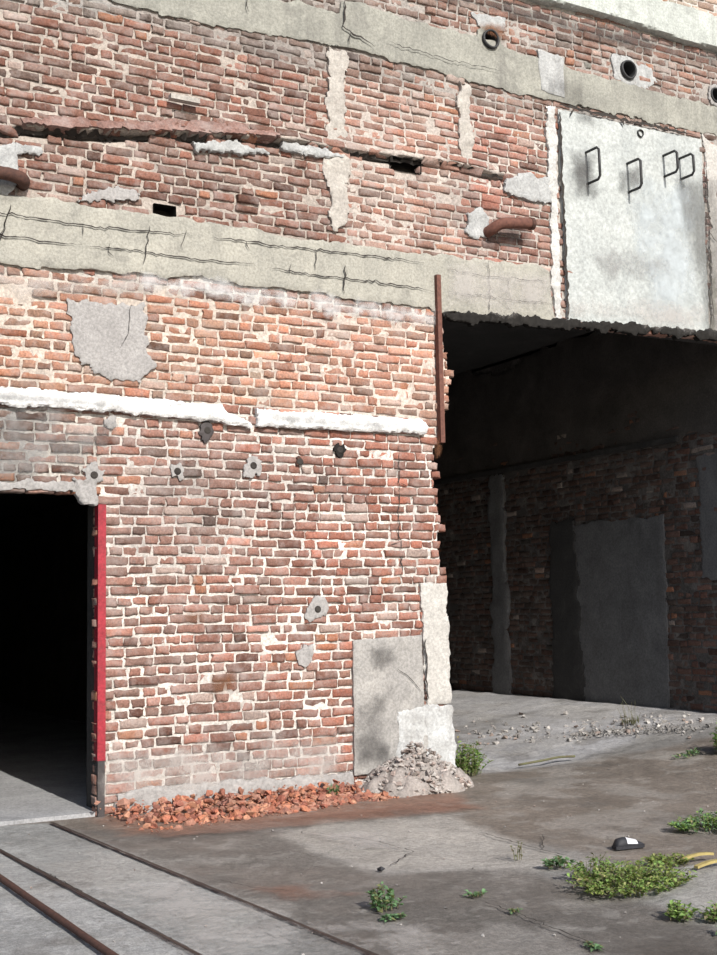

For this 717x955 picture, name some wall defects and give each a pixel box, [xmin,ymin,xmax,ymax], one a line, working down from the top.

crack [342,1,500,71]
crack [0,104,695,319]